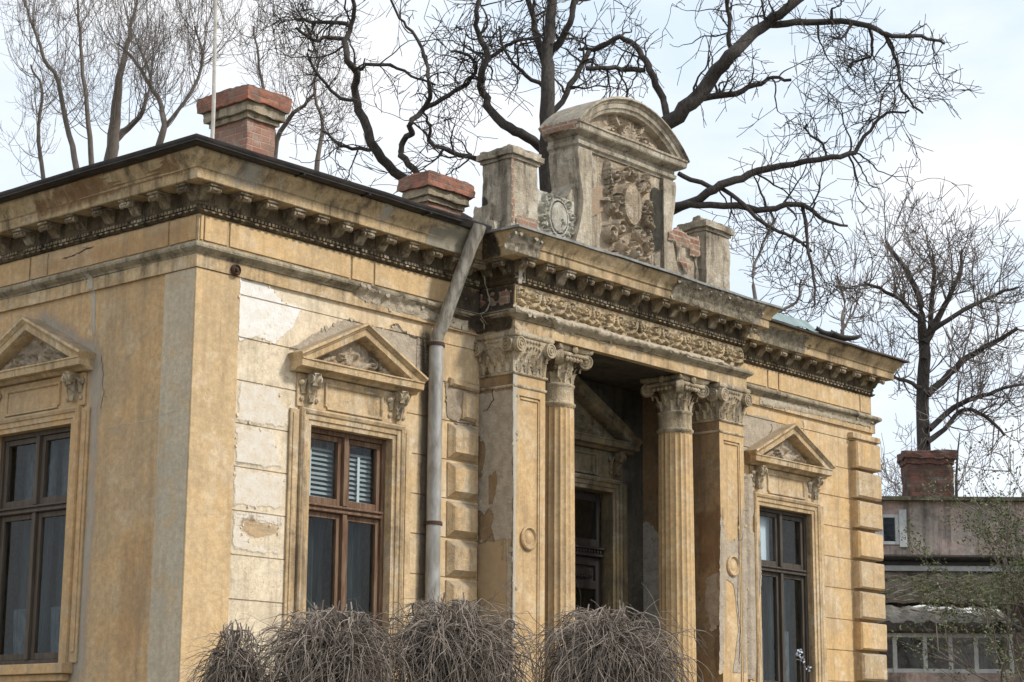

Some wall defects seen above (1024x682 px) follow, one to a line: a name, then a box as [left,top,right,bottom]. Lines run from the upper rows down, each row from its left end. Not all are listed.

peeling [238,277,302,344]
spalling [668,227,767,325]
peeling [232,380,288,554]
flaking render [445,381,514,643]